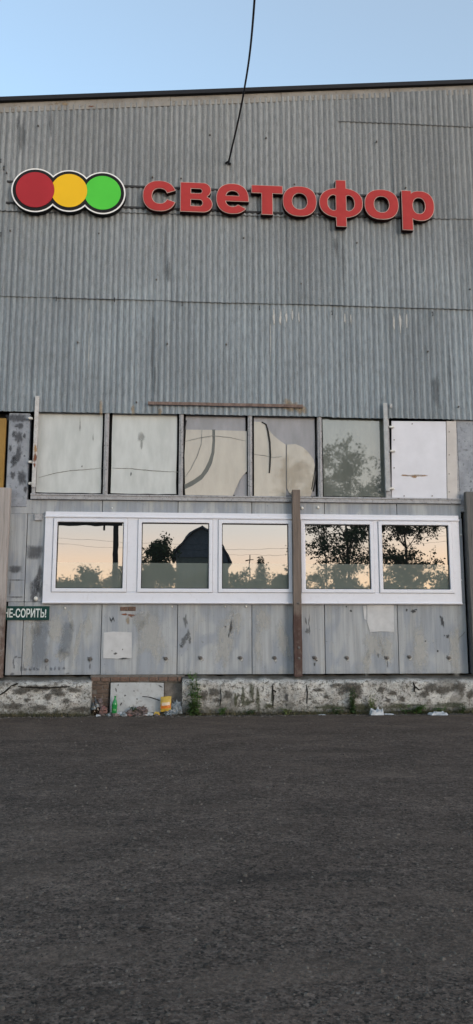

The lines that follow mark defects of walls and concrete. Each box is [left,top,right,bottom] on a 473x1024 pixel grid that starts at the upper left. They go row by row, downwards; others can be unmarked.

water stain [234,684,273,708]